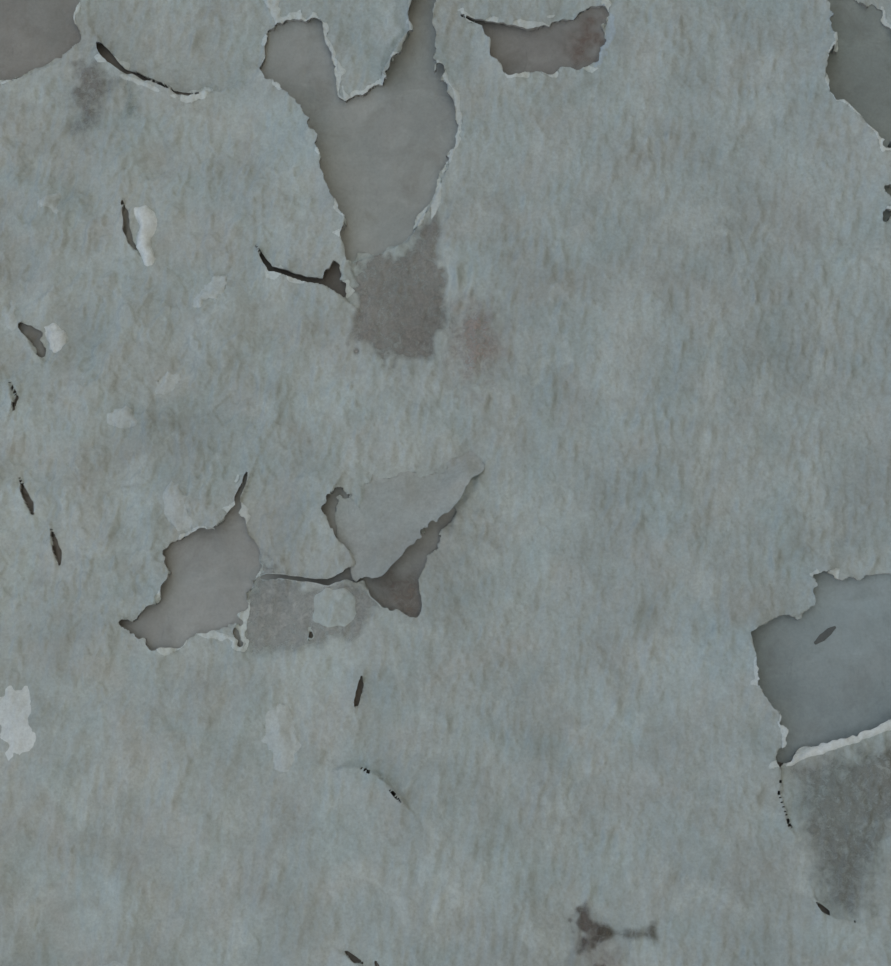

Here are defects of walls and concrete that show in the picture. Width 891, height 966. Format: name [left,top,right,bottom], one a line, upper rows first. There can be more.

peeling [0,0,81,85]
peeling [232,0,616,274]
peeling [765,0,891,222]
peeling [114,200,157,266]
crack [241,245,356,322]
peeling [108,451,485,673]
peeling [707,554,891,795]
crack [336,767,412,812]
crack [337,951,379,966]